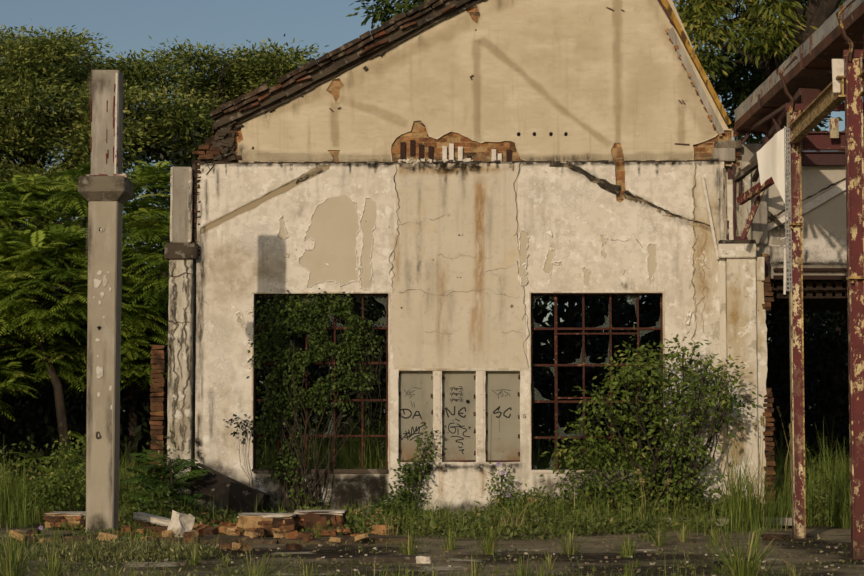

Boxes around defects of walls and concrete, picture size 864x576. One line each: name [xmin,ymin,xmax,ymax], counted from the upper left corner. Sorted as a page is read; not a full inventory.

spalling [464,5,482,31]
spalling [327,79,344,102]
spalling [390,119,527,162]
spalling [611,143,625,203]
peeling [297,195,377,290]
crack [389,160,531,368]
peeling [645,242,657,284]
peeling [93,270,111,305]